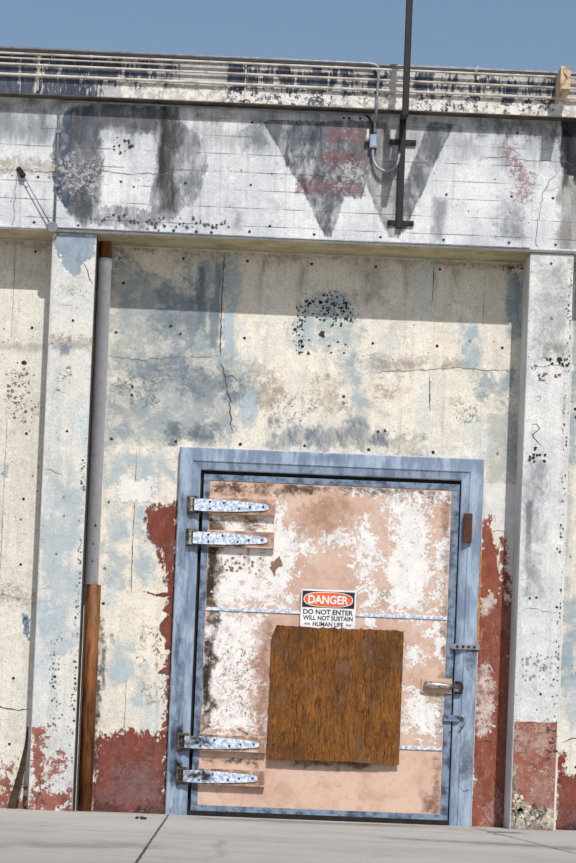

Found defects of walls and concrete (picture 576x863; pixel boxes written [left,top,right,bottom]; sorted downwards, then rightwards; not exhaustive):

peeling [120,81,576,117]
damp [543,121,576,249]
crack [113,253,238,433]
peeling [292,290,356,355]
peeling [0,533,84,811]
peeling [92,473,178,814]
peeling [201,485,451,746]
peeling [472,483,576,830]